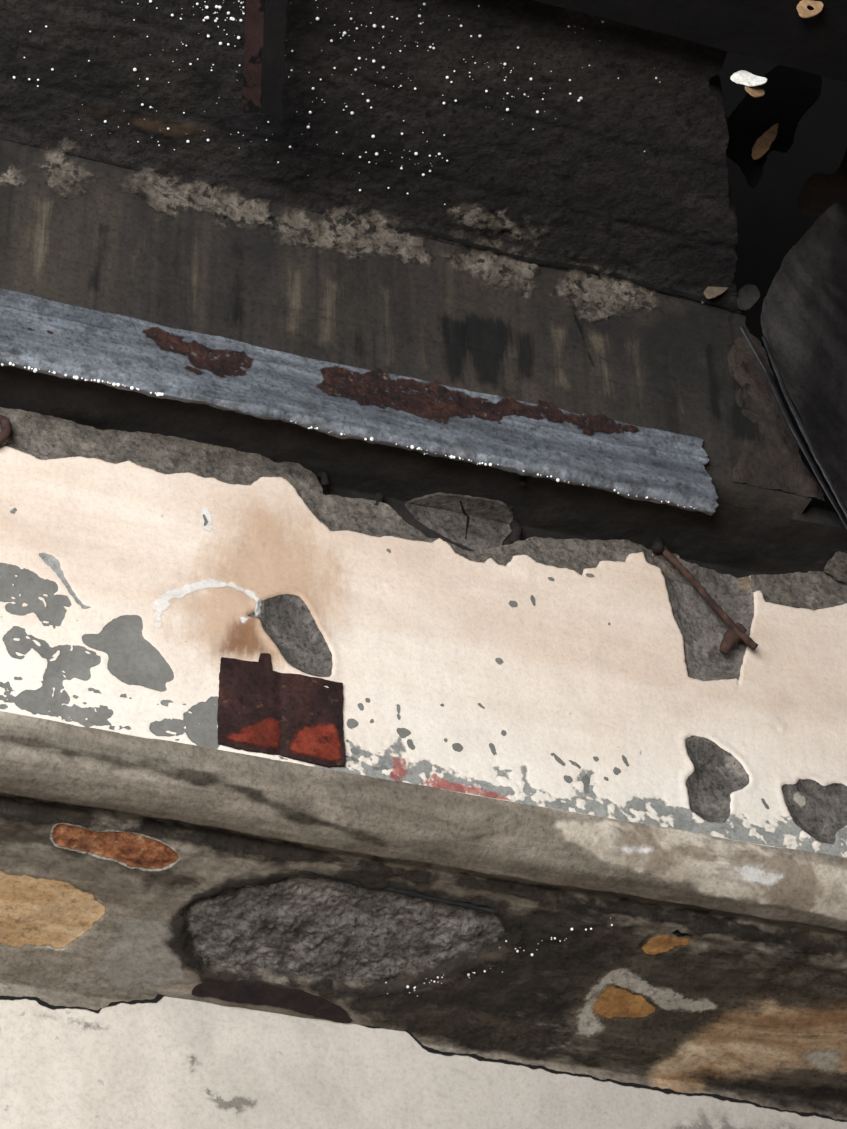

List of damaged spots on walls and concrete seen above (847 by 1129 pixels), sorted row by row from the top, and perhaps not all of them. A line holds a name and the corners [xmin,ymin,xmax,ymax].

rust [143,327,253,377]
rust [316,366,639,436]
spalling [0,407,847,681]
peeling [0,563,220,749]
water stain [0,795,439,888]
spalling [165,870,524,1000]
crack [0,980,847,1122]
peeling [315,698,847,857]
water stain [349,873,847,1072]
peeling [578,968,717,1036]
water stain [556,820,847,921]
water stain [688,1062,847,1117]